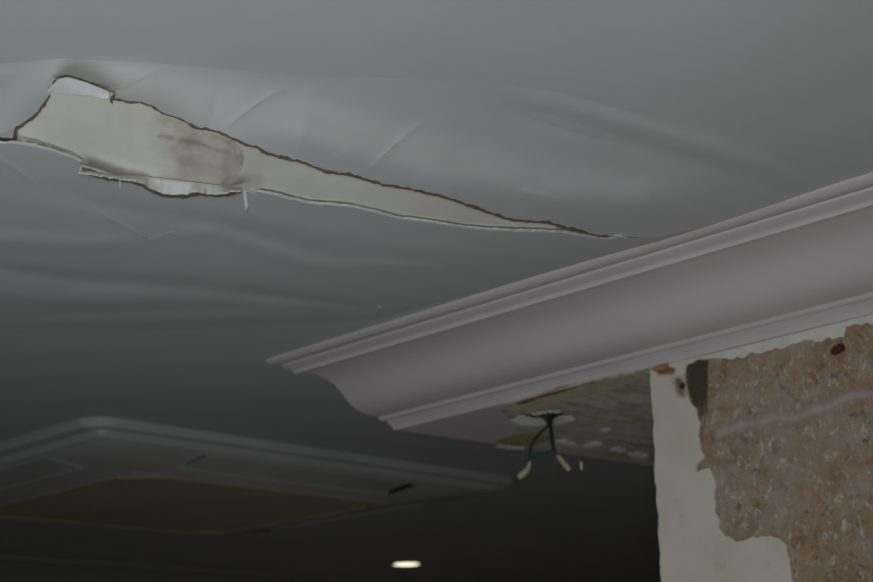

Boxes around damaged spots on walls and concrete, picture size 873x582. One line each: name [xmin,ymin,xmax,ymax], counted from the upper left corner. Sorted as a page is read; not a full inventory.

flaking render [493,367,655,470]
peeling [685,323,873,582]